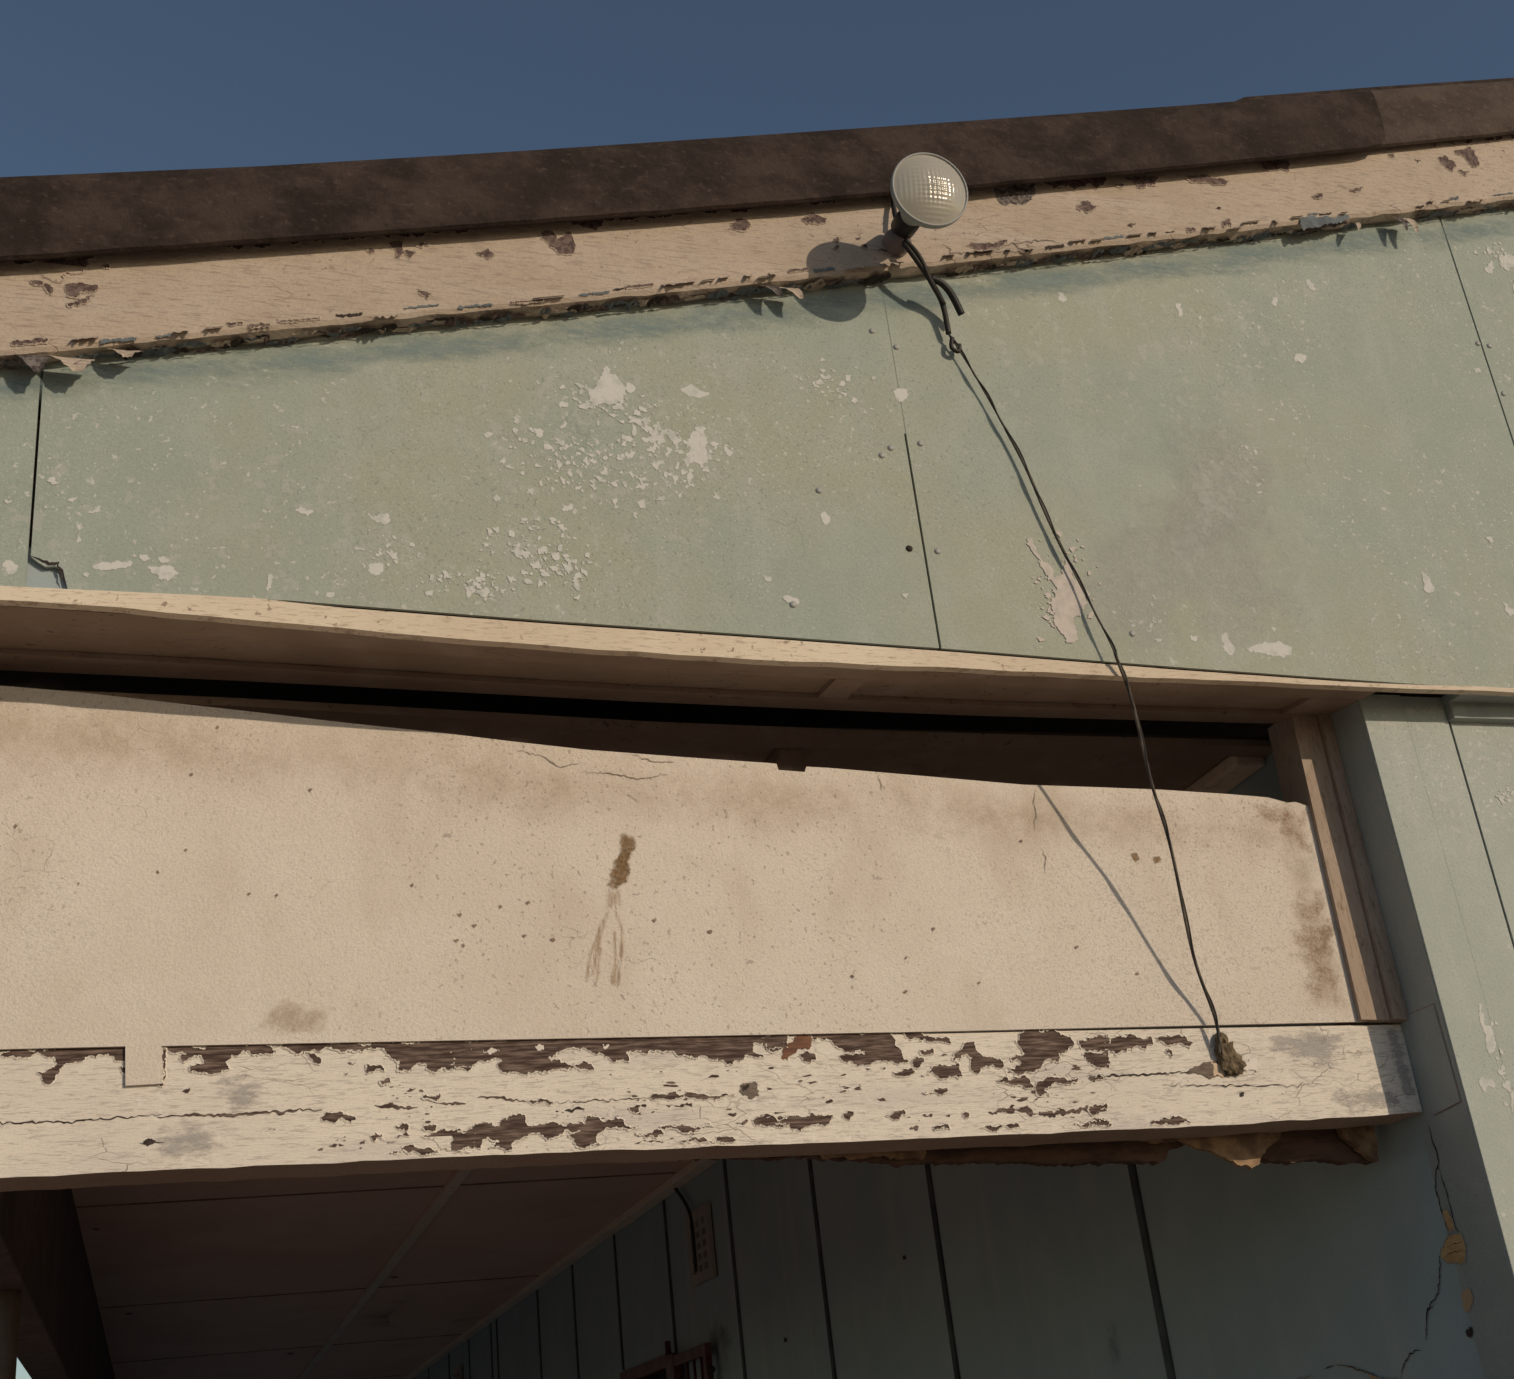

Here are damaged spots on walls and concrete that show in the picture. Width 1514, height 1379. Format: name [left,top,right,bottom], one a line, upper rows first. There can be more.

peeling [994,174,1159,213]
peeling [941,192,1361,277]
peeling [1261,160,1290,172]
peeling [1390,192,1514,232]
peeling [1415,135,1514,176]
peeling [0,201,904,372]
peeling [326,366,739,601]
peeling [1026,531,1102,643]
water stain [609,835,635,888]
peeling [0,1047,125,1086]
peeling [158,1029,1194,1157]
crack [1299,1128,1467,1379]